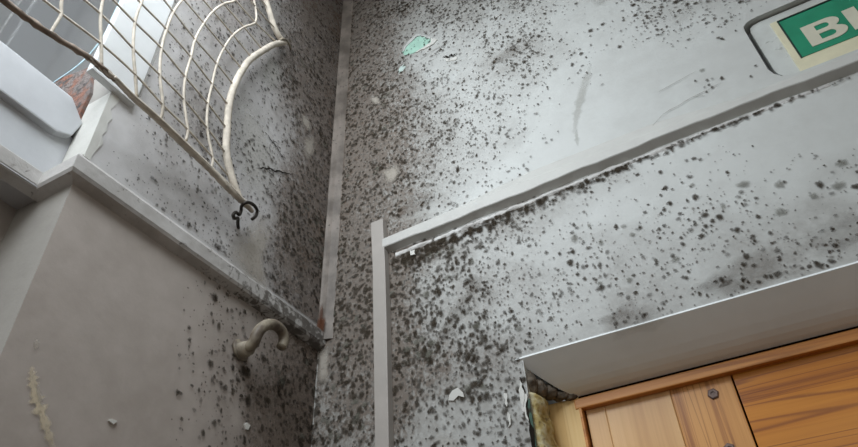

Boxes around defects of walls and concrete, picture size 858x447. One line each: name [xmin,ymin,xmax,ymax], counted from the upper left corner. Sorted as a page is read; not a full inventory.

leakage [127,0,604,447]
leakage [388,133,858,447]
leakage [616,0,752,48]
leakage [713,88,818,130]